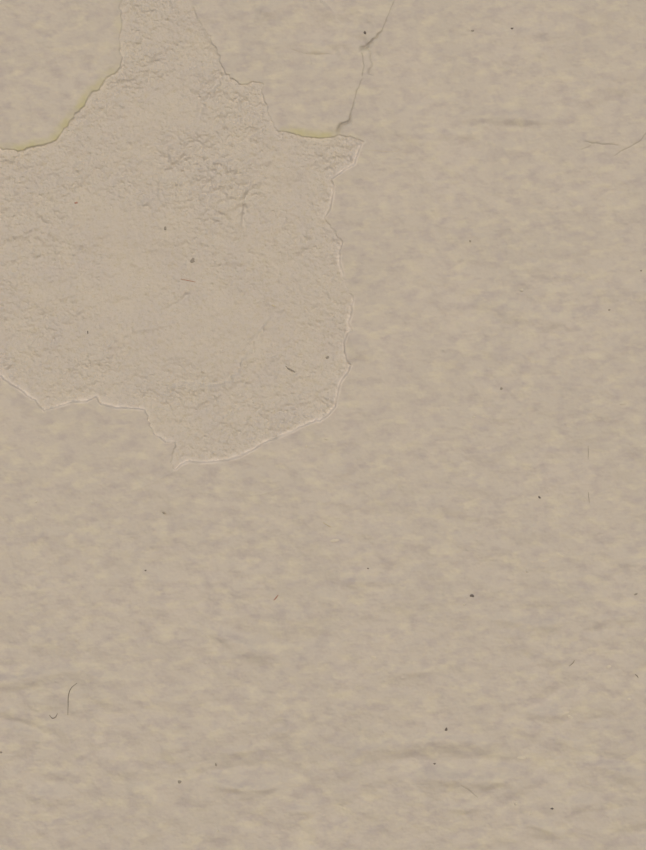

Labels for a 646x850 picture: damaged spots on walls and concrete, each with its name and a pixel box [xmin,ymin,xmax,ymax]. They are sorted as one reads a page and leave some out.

peeling [0,0,373,472]
crack [340,0,396,123]